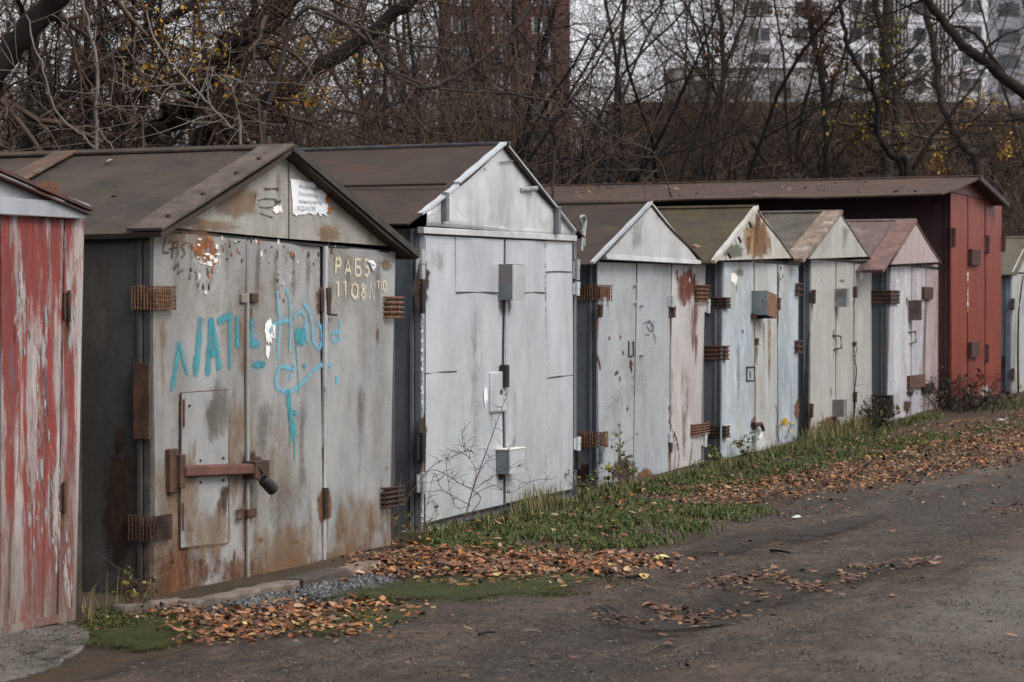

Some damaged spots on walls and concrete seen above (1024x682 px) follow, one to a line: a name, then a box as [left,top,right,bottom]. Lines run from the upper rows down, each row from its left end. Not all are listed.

peeling [187,234,340,303]
rust [745,213,771,259]
peeling [69,297,77,375]
peeling [14,262,73,608]
rust [144,386,307,598]
rust [317,490,377,544]